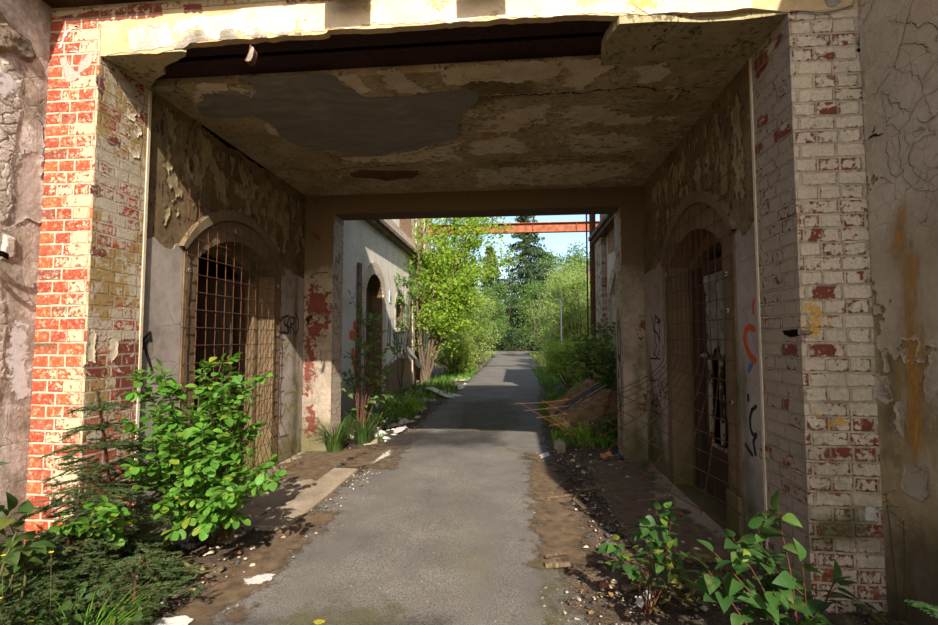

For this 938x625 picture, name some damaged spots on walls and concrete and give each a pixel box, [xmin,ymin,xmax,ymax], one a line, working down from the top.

crack [23,118,45,164]
peeling [192,82,256,107]
peeling [162,104,306,257]
peeling [338,74,372,95]
peeling [376,68,429,95]
peeling [62,0,753,52]
peeling [648,93,791,240]
peeling [857,0,938,439]
crack [863,0,938,193]
flaking render [301,272,334,438]